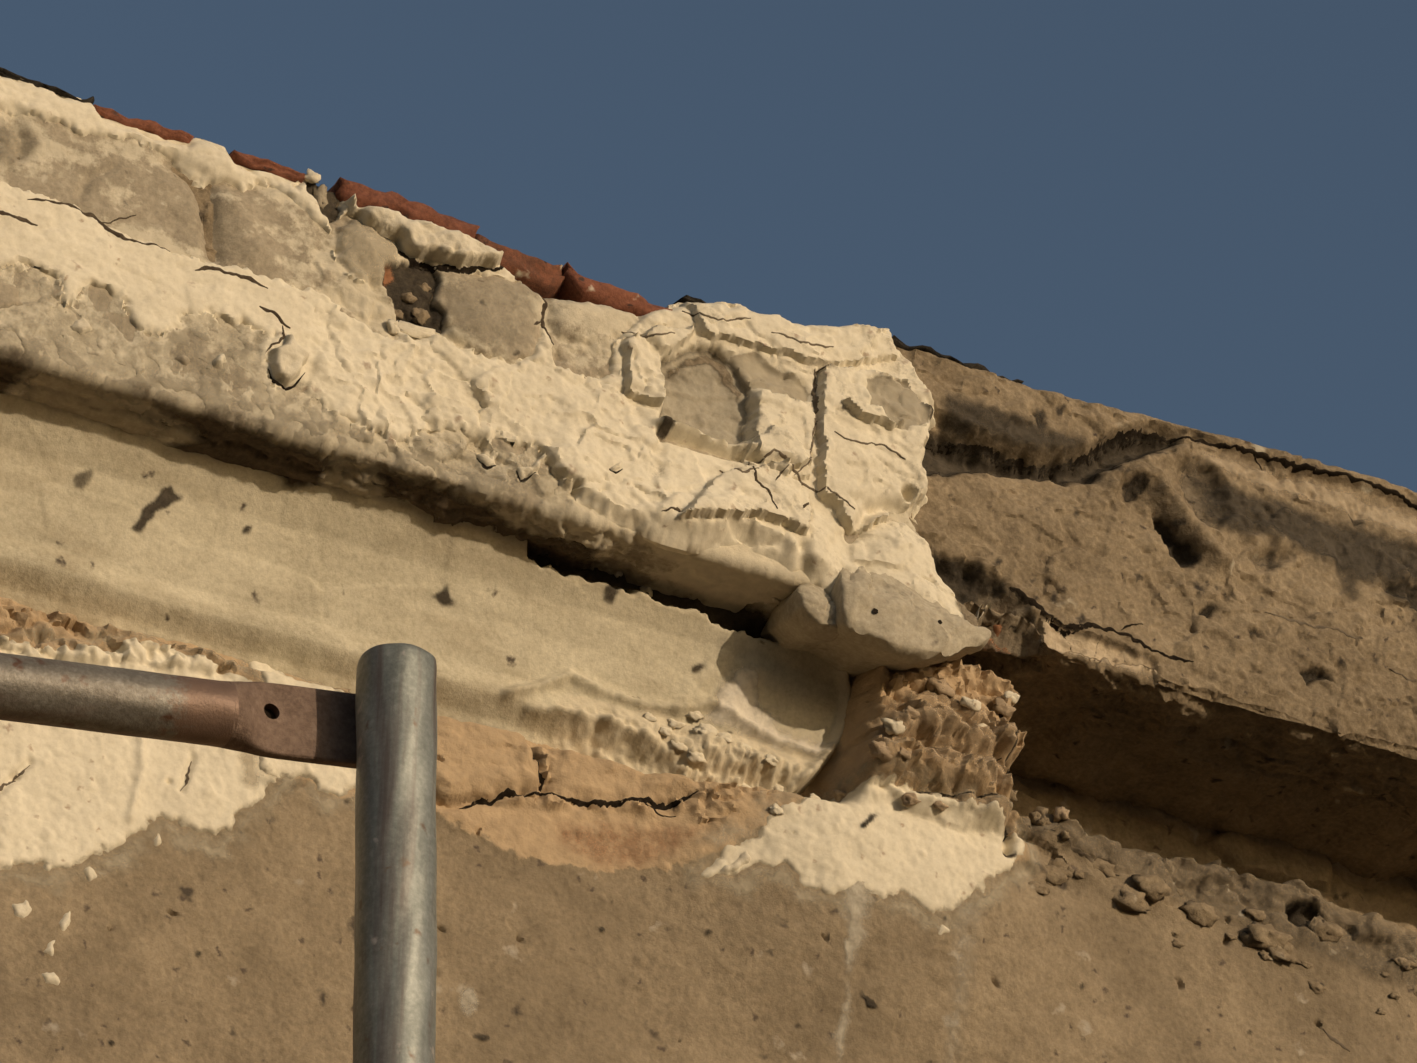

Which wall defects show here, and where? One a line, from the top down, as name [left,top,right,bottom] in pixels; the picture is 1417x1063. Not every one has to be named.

crack [0,198,291,352]
spalling [382,263,443,339]
crack [621,310,1417,510]
crack [1009,587,1194,663]
spalling [868,706,920,763]
crack [459,757,699,817]
spalling [833,789,847,802]
spalling [901,792,949,811]
spalling [1019,806,1417,1015]